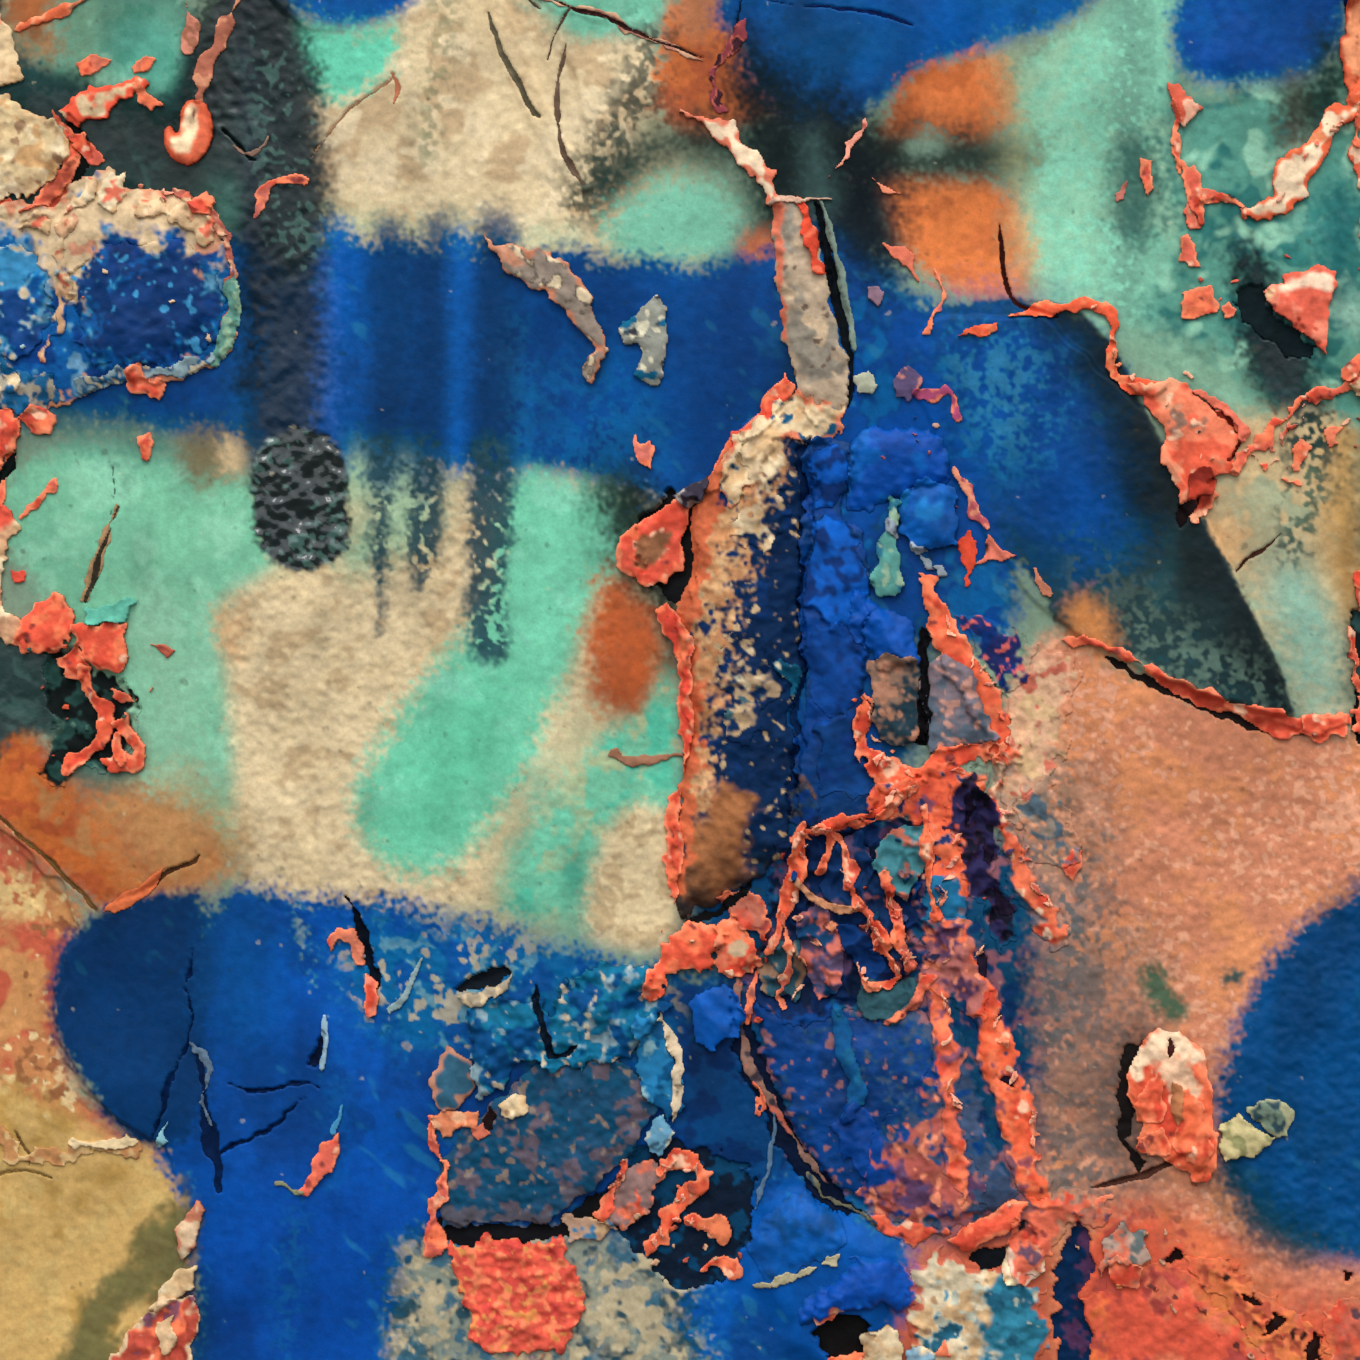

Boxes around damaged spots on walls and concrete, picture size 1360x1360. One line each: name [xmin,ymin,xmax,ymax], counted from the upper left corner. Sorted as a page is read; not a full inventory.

crack [14,0,86,32]
peeling [0,0,242,788]
crack [221,128,269,161]
crack [311,72,401,158]
peeling [484,234,668,386]
crack [488,0,913,474]
peeling [958,296,1360,527]
peeling [1167,0,1360,359]
crack [0,815,200,914]
peeling [423,366,1360,1360]
crack [152,952,320,1193]
peeling [109,1200,205,1360]